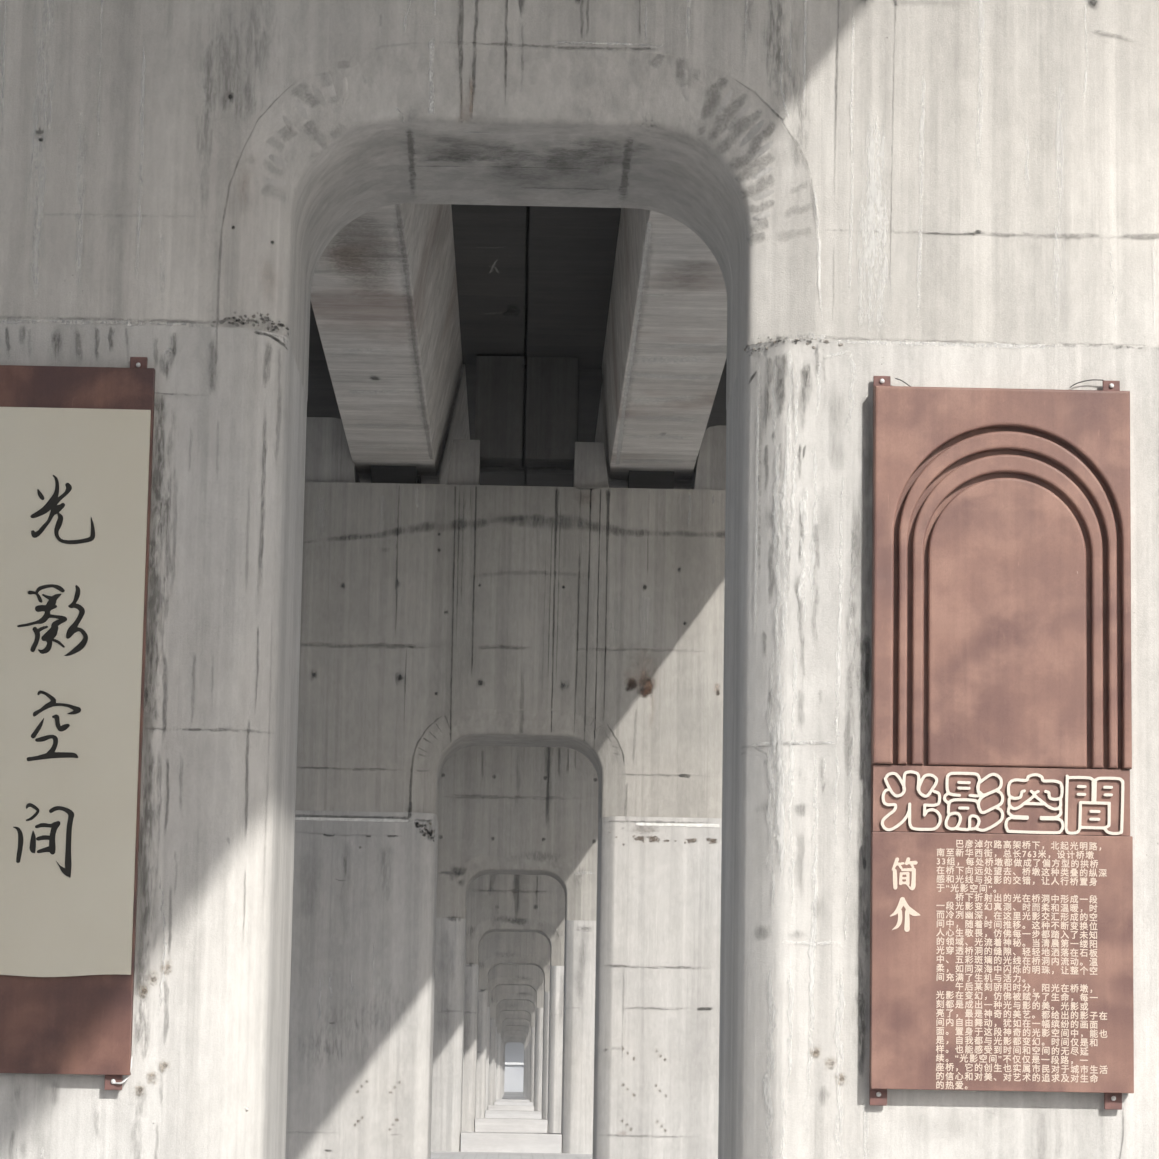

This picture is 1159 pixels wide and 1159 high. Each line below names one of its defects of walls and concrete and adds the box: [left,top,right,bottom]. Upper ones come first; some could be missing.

rust [627,675,654,697]